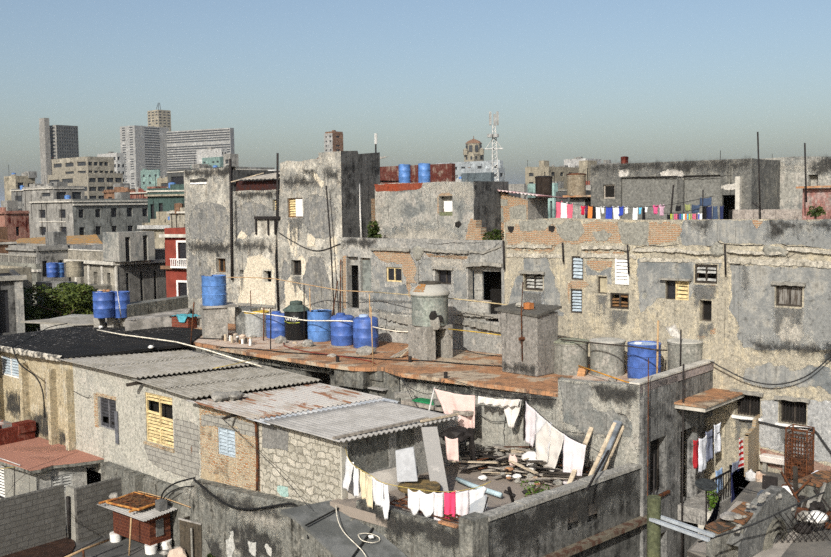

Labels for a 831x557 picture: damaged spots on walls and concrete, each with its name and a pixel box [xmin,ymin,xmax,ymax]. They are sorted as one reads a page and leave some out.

damp [284,169,314,186]
damp [188,191,279,257]
peeling [238,172,346,311]
damp [289,218,302,245]
peeling [372,250,468,314]
peeling [501,199,831,316]
peeling [637,257,831,473]
damp [755,343,831,357]
peeling [559,381,639,464]
peeling [226,531,235,557]
peeling [248,541,272,556]